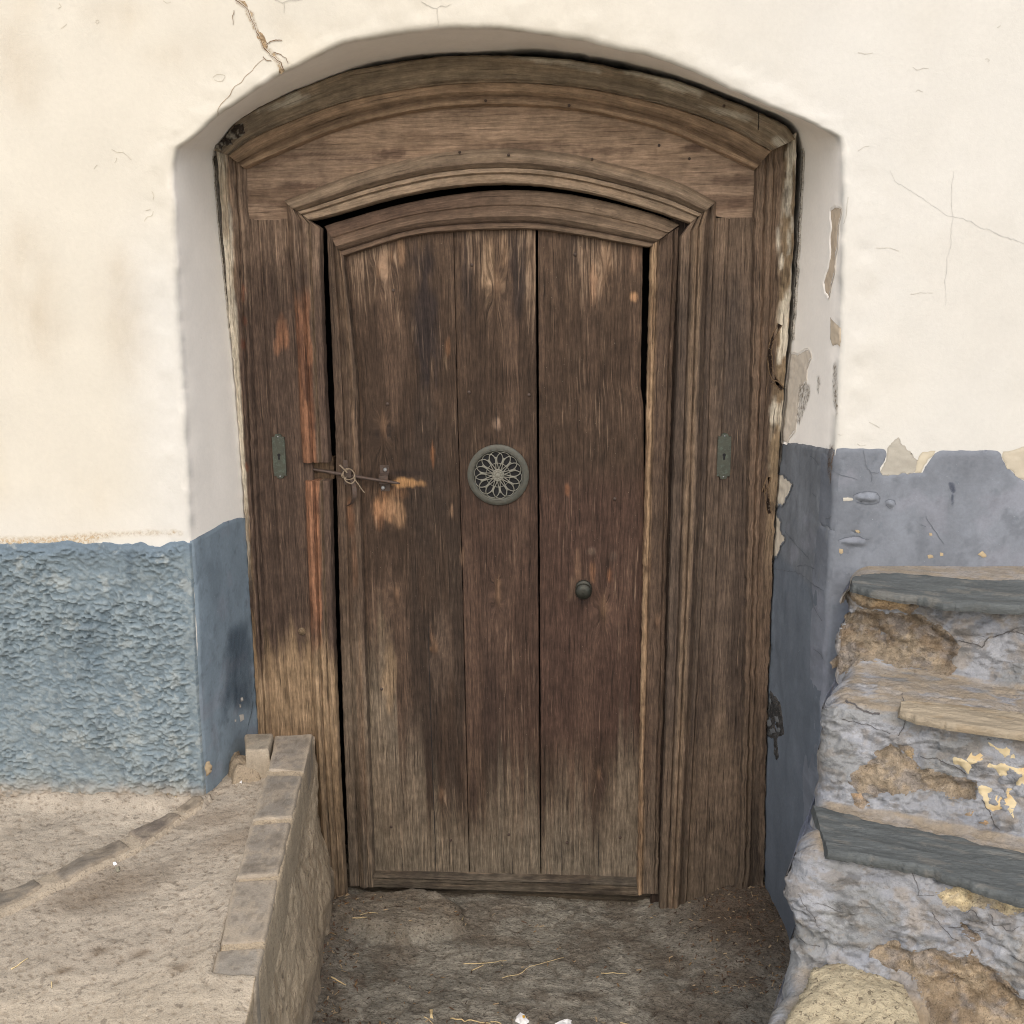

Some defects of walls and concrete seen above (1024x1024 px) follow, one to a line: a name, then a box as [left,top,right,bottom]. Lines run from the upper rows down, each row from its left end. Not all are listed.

crack [218,0,288,109]
peeling [823,197,849,298]
crack [890,170,1024,305]
peeling [830,317,841,346]
peeling [767,323,812,445]
peeling [880,437,935,476]
peeling [1002,447,1024,480]
spalling [830,589,962,676]
spalling [848,742,1024,825]
spalling [869,887,1024,1024]